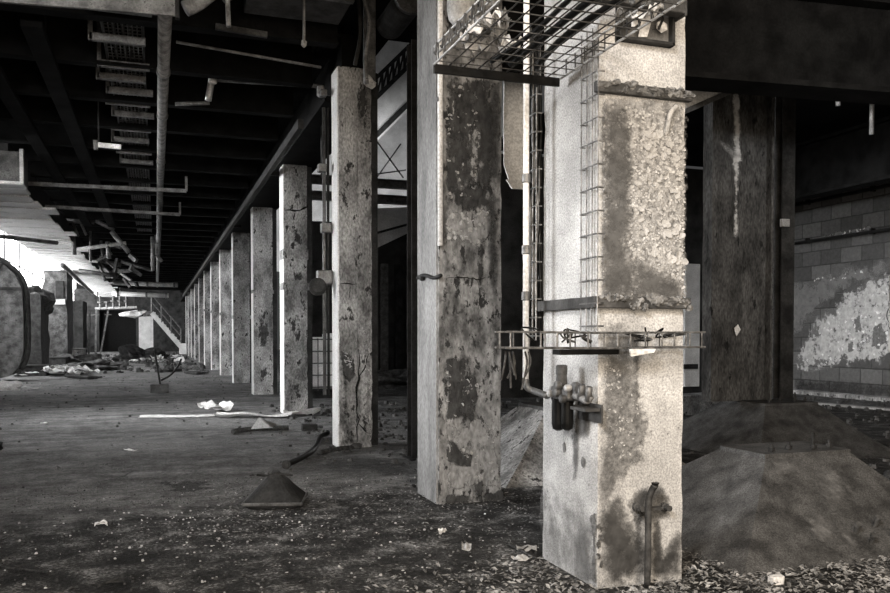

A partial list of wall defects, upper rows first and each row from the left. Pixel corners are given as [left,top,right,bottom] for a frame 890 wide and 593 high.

damp [477,201,497,297]
damp [489,87,500,177]
peeling [601,98,689,297]
damp [721,94,741,234]
peeling [794,260,890,371]
crack [355,349,371,442]
peeling [446,357,500,489]
damp [606,336,639,428]
damp [601,446,681,585]